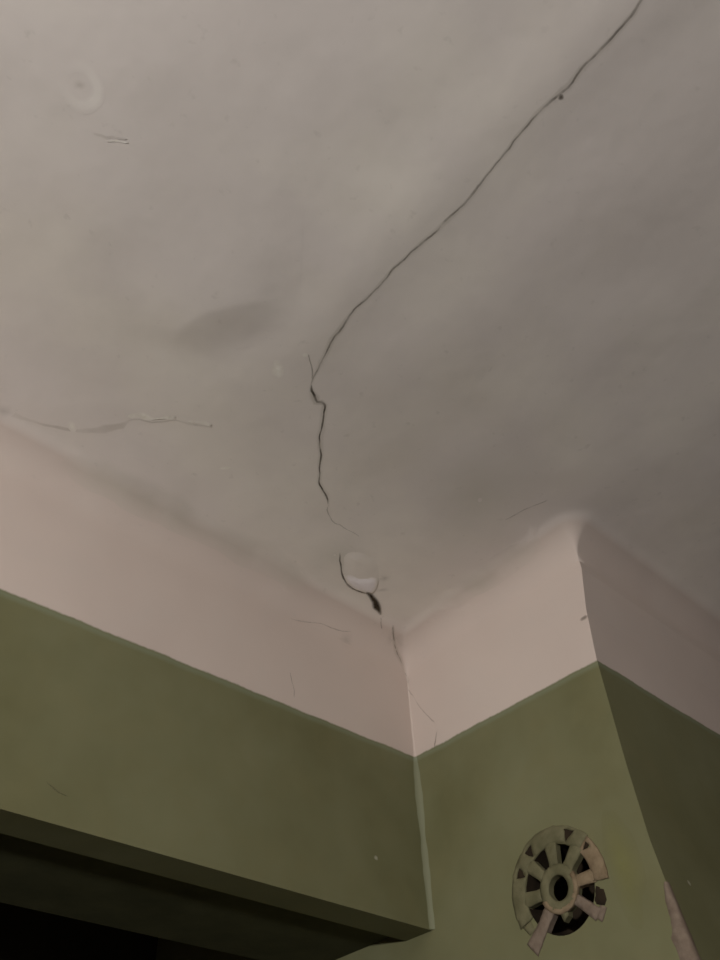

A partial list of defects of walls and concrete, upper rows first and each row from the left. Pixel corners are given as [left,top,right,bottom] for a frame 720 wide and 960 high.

crack [308,0,645,504]
crack [0,402,212,435]
crack [374,625,410,688]